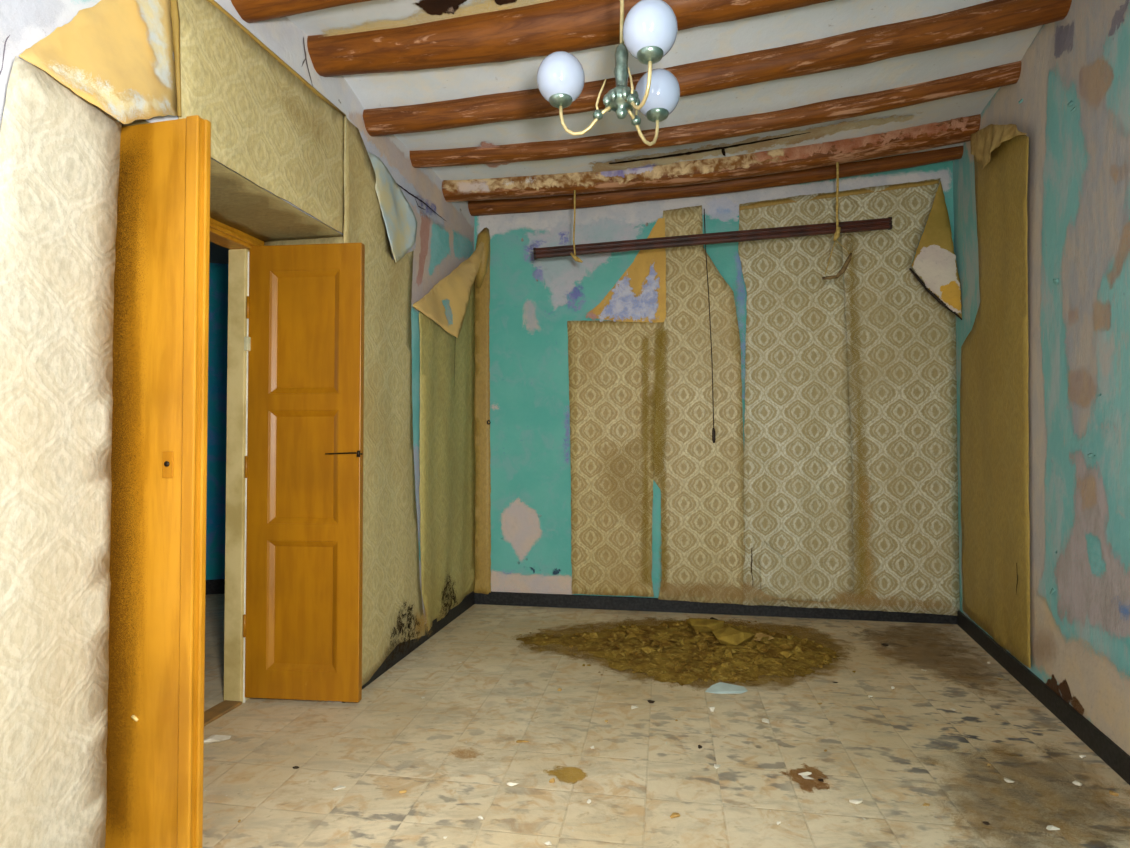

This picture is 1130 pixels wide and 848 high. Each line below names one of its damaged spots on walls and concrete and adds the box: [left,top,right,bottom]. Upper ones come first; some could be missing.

peeling [320,0,554,37]
peeling [339,100,952,562]
flaking render [979,22,1130,756]
flaking render [491,497,572,595]
water stain [385,574,460,672]